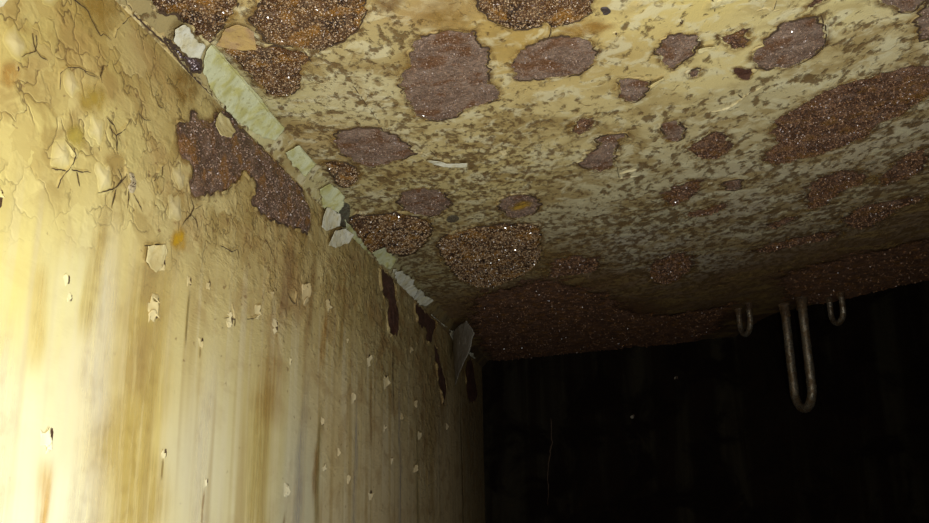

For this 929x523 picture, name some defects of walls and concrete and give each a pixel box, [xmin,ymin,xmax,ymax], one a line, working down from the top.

crack [21,33,104,89]
crack [51,97,163,210]
crack [74,0,223,107]
peeling [174,25,285,141]
rust [174,107,311,237]
rust [150,0,398,98]
peeling [286,145,317,177]
peeling [427,160,467,168]
rust [474,0,607,82]
rust [762,63,929,165]
crack [144,239,165,247]
peeling [320,184,475,385]